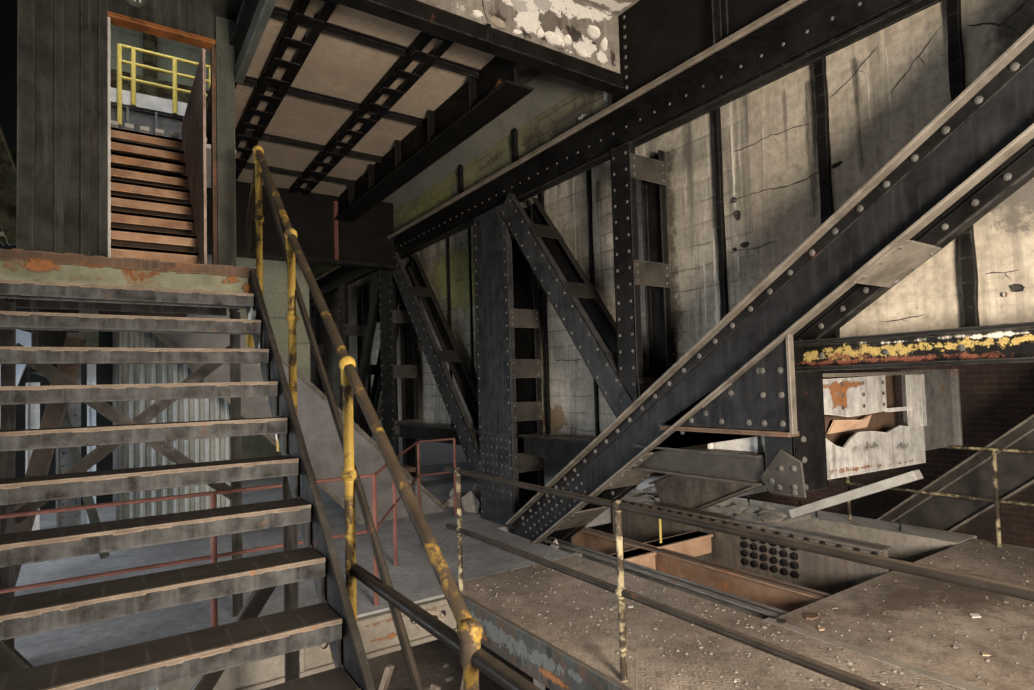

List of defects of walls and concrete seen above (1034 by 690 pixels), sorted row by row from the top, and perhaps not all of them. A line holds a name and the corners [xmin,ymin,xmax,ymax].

peeling [456,0,613,65]
crack [890,0,1027,95]
damp [991,178,1034,233]
corrosion [5,258,61,273]
corrosion [794,334,1034,366]
corrosion [823,381,862,408]